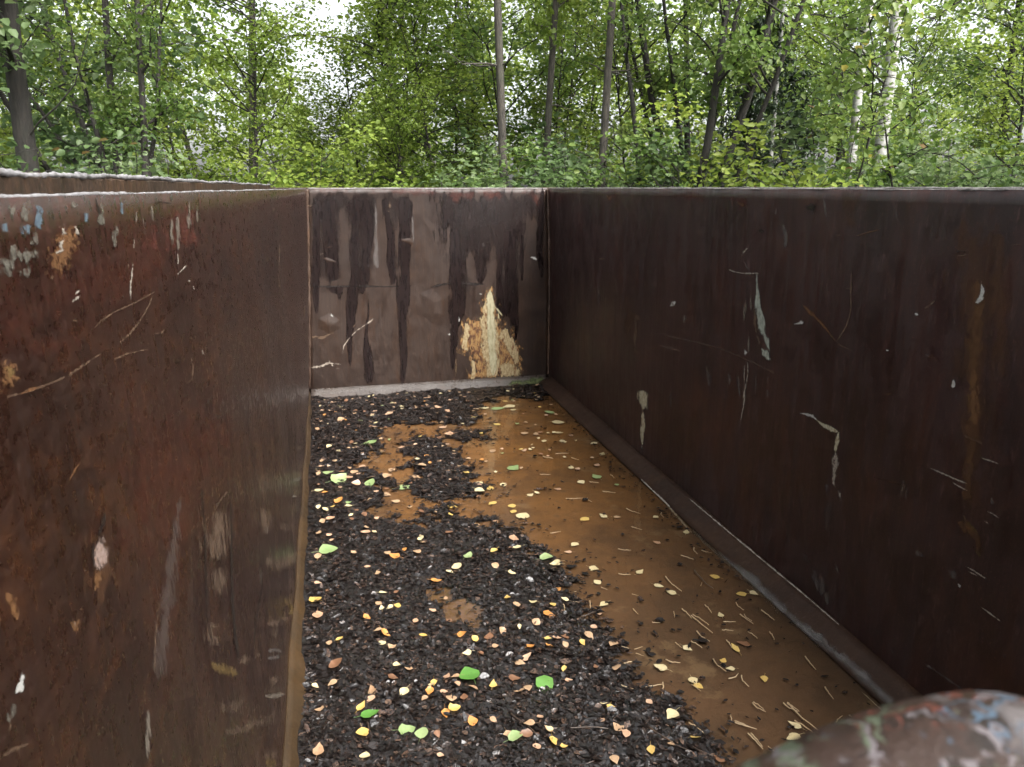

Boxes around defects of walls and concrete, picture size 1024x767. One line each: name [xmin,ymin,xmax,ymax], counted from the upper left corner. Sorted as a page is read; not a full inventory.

rust [2,362,18,387]
peeling [0,205,43,277]
rust [48,226,80,279]
water stain [311,192,413,384]
peeling [449,286,523,379]
water stain [429,188,545,370]
peeling [743,274,771,361]
peeling [801,413,841,497]